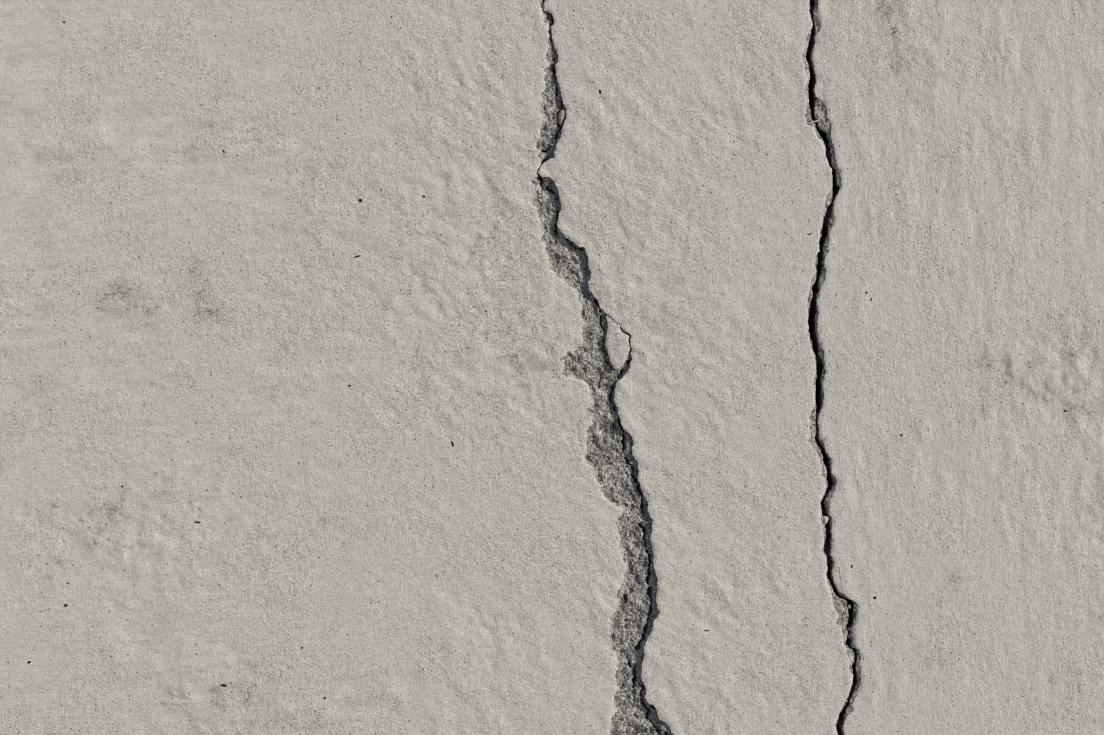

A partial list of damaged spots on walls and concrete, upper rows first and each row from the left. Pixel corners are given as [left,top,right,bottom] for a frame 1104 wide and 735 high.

crack [531,0,674,735]
crack [802,0,861,735]